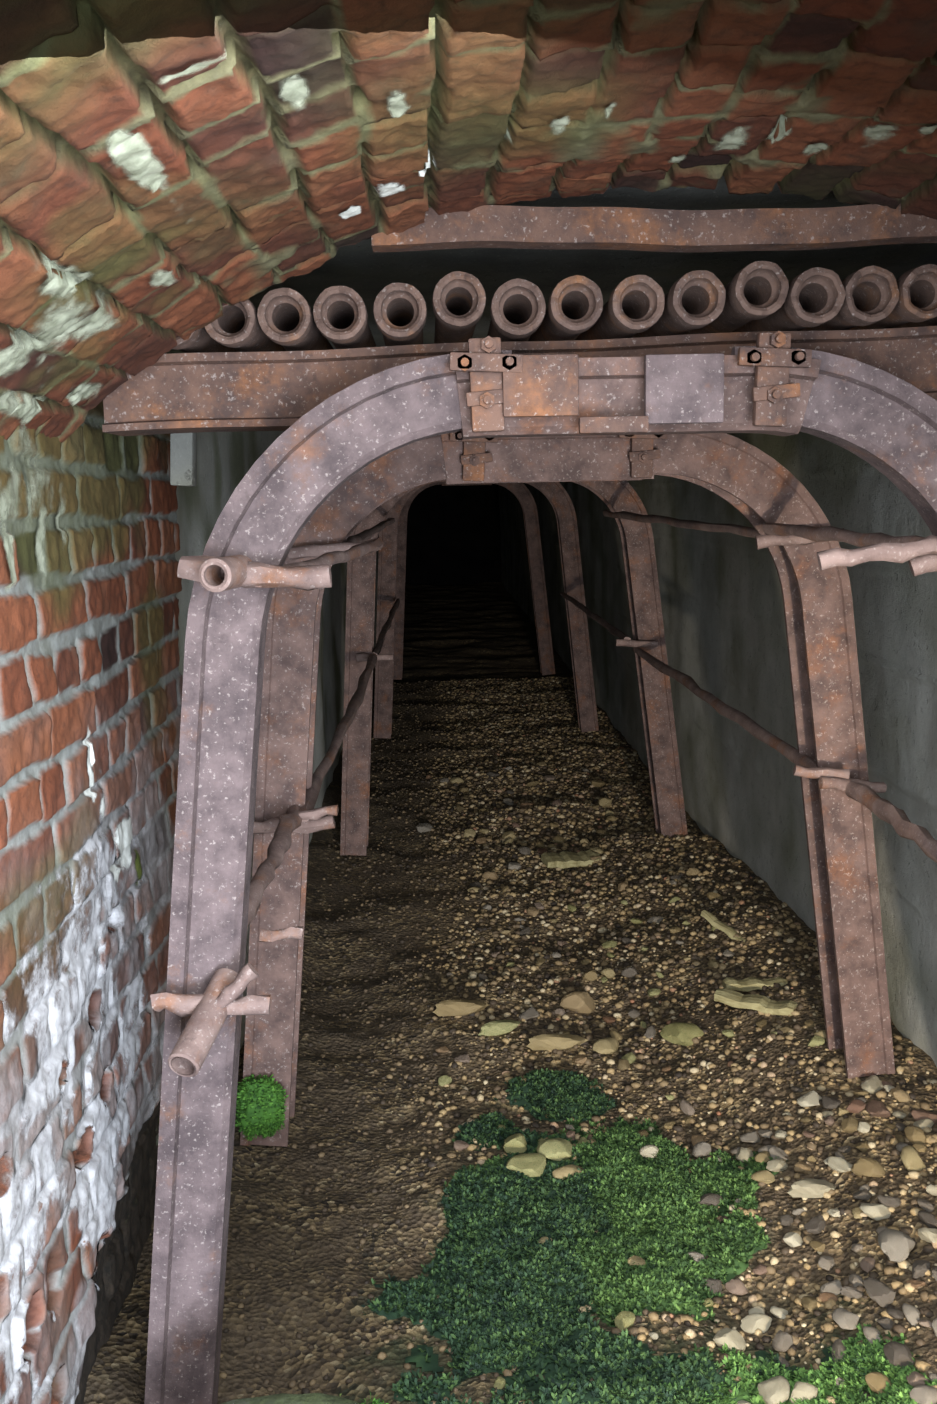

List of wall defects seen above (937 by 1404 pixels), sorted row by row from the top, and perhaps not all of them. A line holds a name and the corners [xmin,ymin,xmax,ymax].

leakage [162,57,224,83]
leakage [280,75,308,107]
leakage [389,93,409,118]
leakage [108,131,168,192]
leakage [150,271,175,286]
leakage [0,254,112,376]
leakage [67,384,101,405]
leakage [0,391,65,589]
leakage [83,728,133,882]